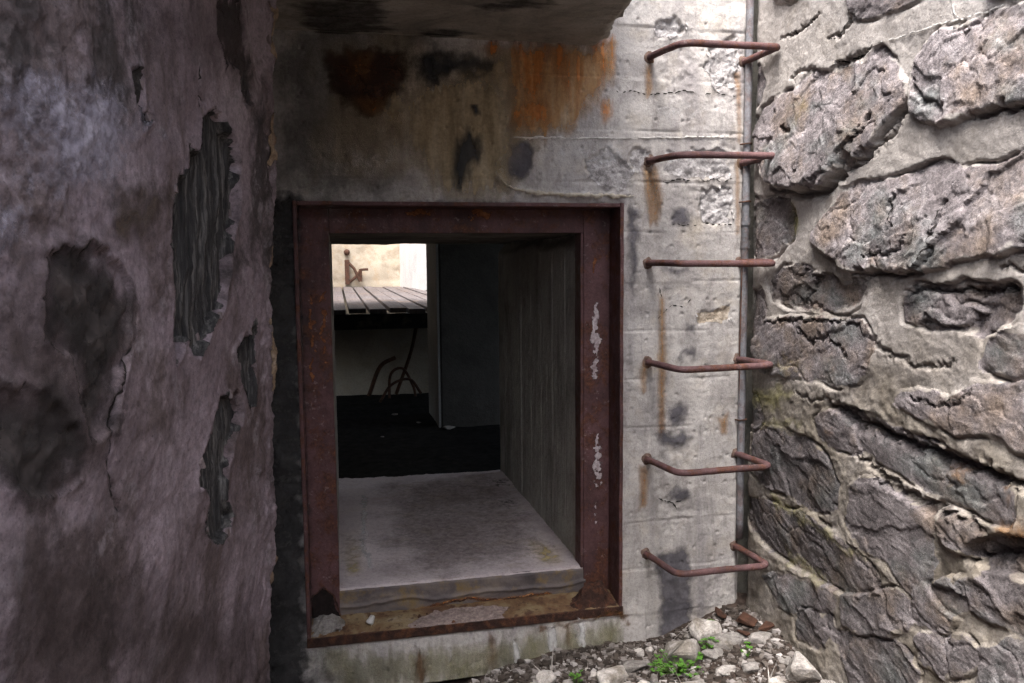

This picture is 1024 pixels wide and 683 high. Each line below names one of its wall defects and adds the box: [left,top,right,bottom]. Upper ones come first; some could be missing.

rust [510,36,614,137]
damp [324,49,639,275]
flaking render [170,107,240,357]
damp [0,247,136,501]
peeling [590,302,602,379]
flaking render [199,318,278,545]
peeling [592,434,603,487]
rust [408,592,550,628]
damp [655,548,692,636]